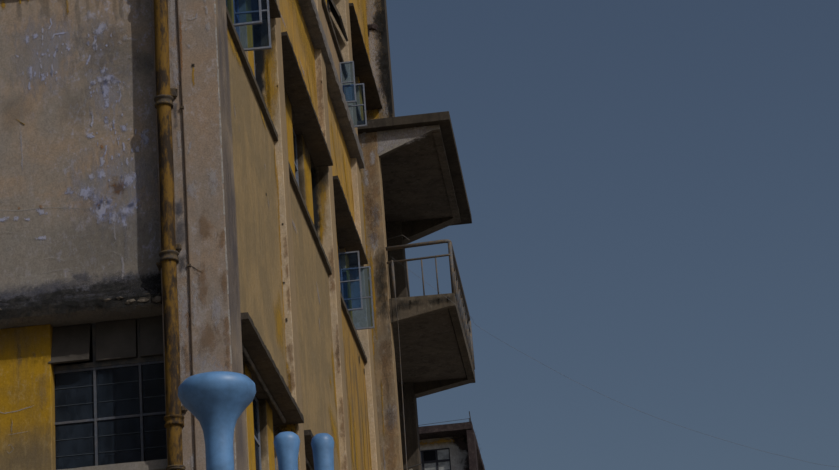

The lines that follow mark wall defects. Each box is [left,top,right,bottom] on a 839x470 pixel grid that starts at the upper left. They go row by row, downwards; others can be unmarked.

damp [358,0,393,118]
peeling [65,112,151,226]
damp [0,223,161,325]